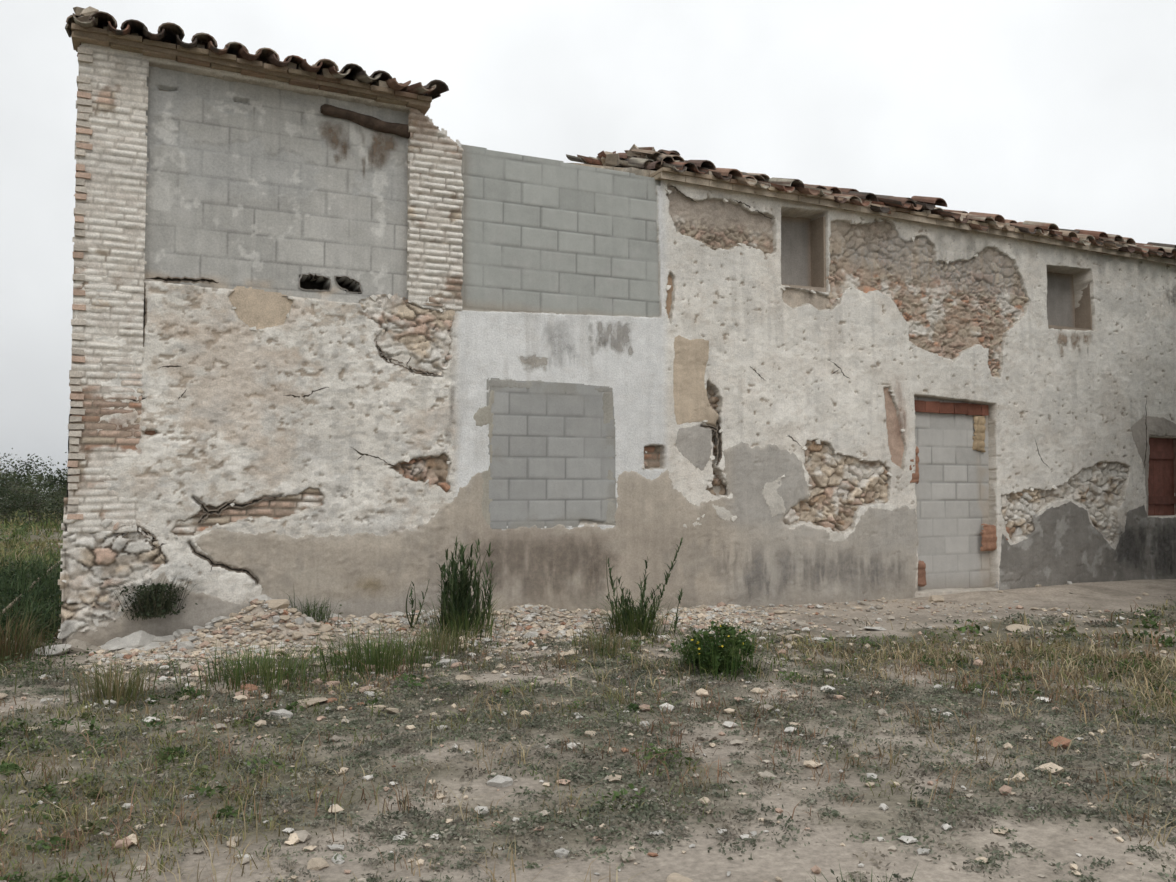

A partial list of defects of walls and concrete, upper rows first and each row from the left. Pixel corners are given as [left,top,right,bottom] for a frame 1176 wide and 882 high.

flaking render [665,185,774,254]
peeling [229,286,293,331]
flaking render [334,275,455,376]
flaking render [780,218,1029,378]
flaking render [57,498,165,640]
crack [116,495,280,585]
flaking render [171,488,324,538]
flaking render [391,454,451,492]
flaking render [782,388,919,533]
flaking render [980,462,1128,551]